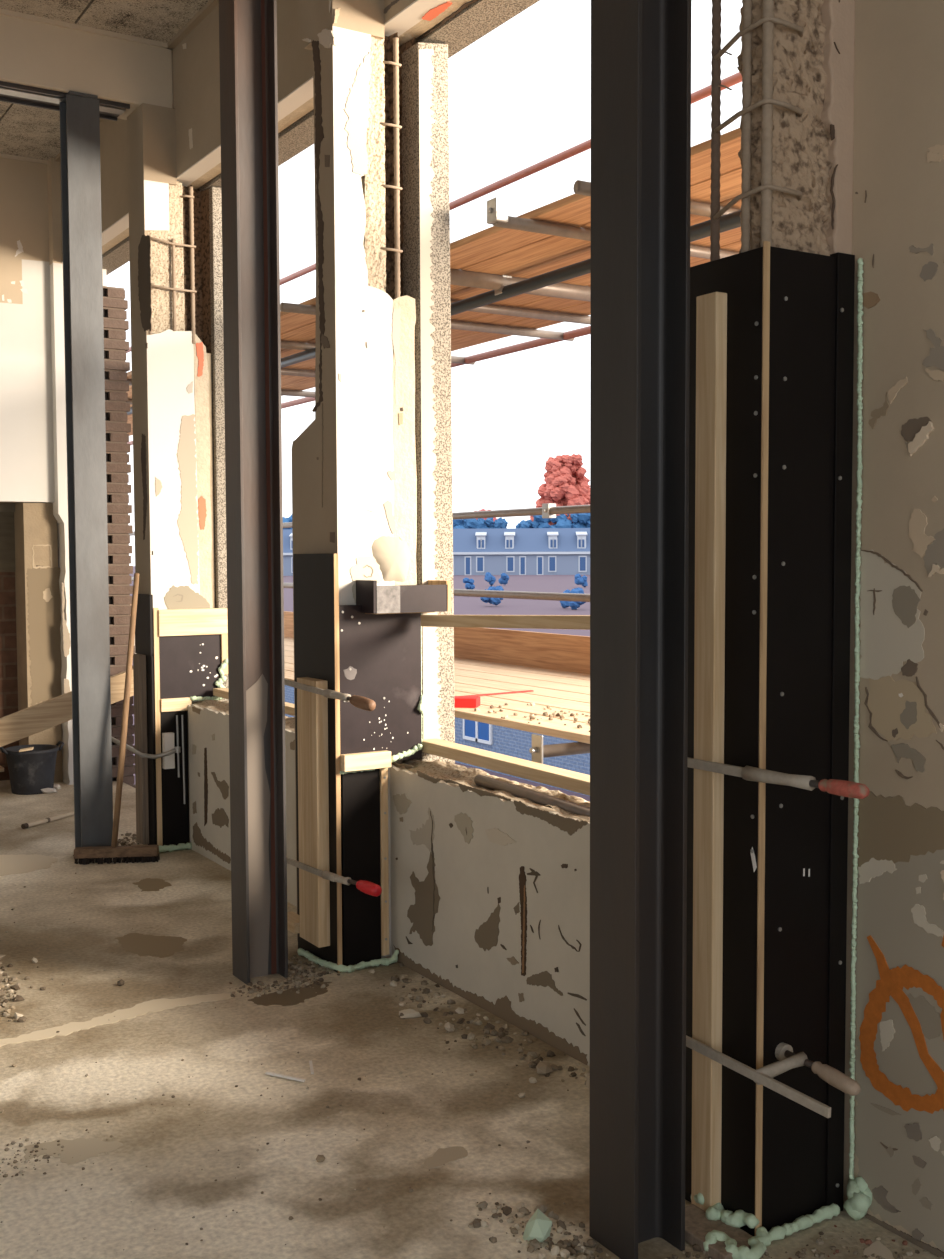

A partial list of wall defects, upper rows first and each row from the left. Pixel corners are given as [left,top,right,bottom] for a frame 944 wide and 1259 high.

spalling [710,0,722,261]
spalling [737,0,835,256]
spalling [344,32,417,585]
spalling [141,434,162,540]
crack [861,550,923,615]
crack [864,687,887,741]
crack [916,676,944,750]
damp [246,674,270,978]
damp [114,933,187,958]
damp [248,982,332,1006]
spalling [394,946,588,1065]
flaking render [851,849,944,1252]